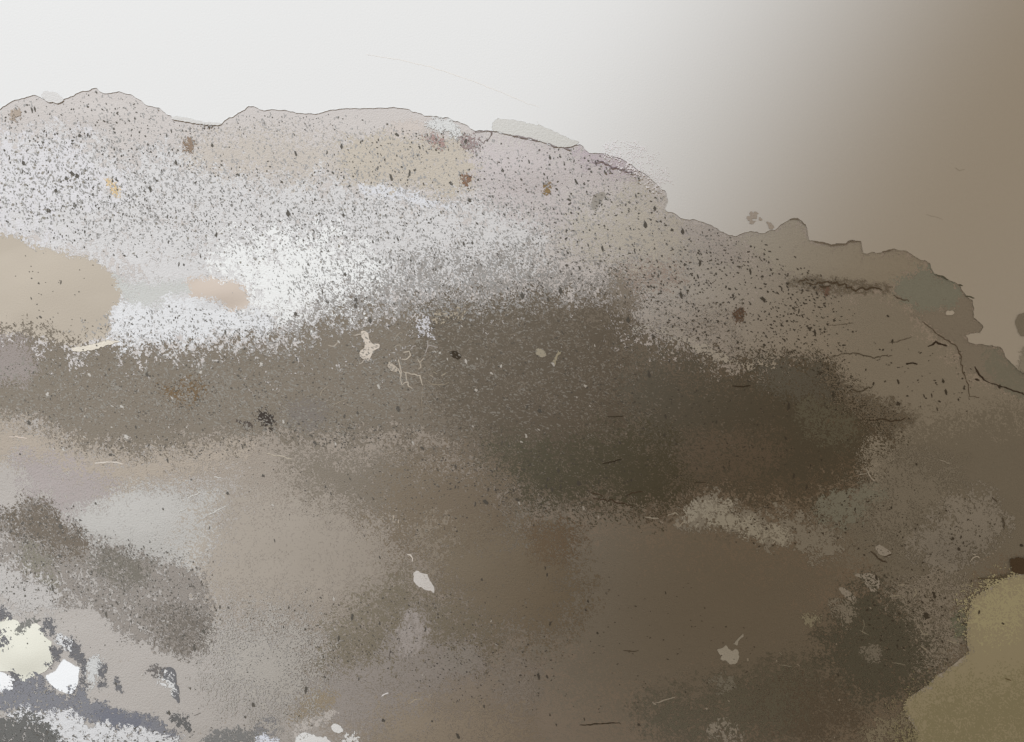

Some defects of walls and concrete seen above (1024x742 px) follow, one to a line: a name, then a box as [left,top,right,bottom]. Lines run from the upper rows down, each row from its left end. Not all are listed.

spalling [0,88,1024,411]
crack [798,278,909,302]
crack [832,322,1024,398]
peeling [0,617,80,694]